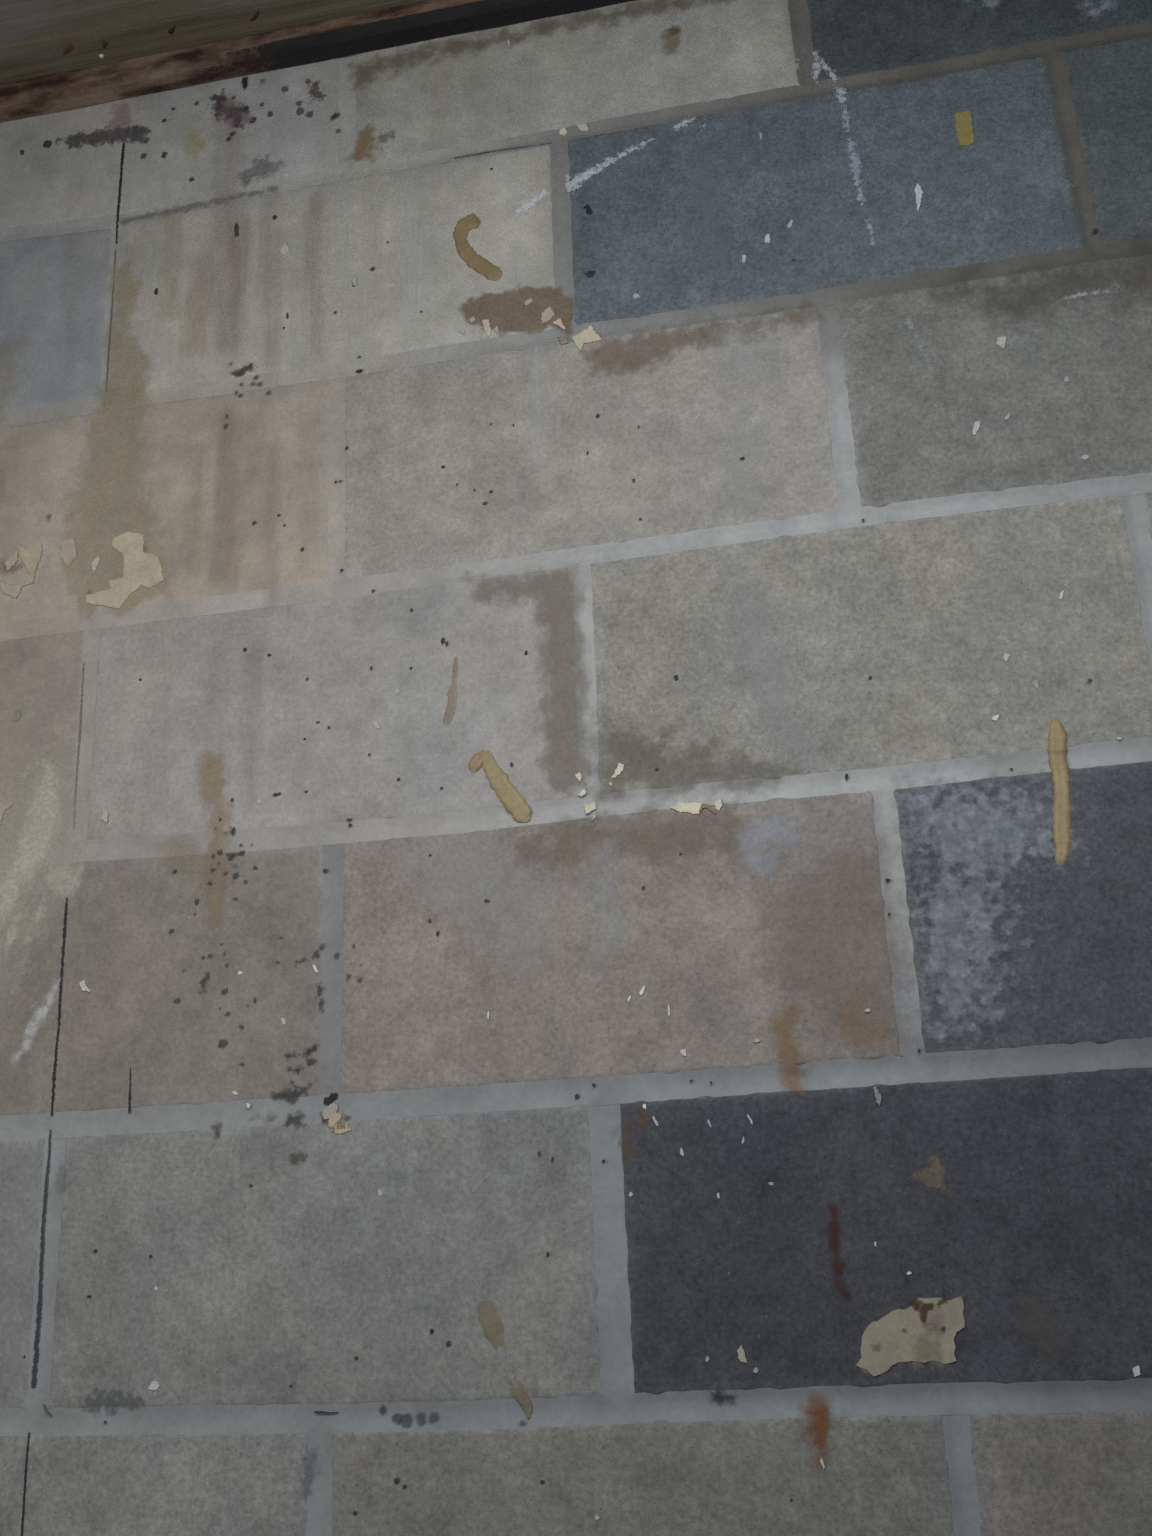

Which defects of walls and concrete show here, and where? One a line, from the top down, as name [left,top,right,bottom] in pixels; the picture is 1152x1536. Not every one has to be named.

crack [105,143,125,394]
peeling [458,286,601,351]
peeling [0,532,164,609]
crack [73,662,84,829]
leakage [46,864,83,897]
leakage [14,984,57,1060]
crack [21,897,68,1536]
spalling [856,1296,965,1376]
crack [314,1408,339,1416]